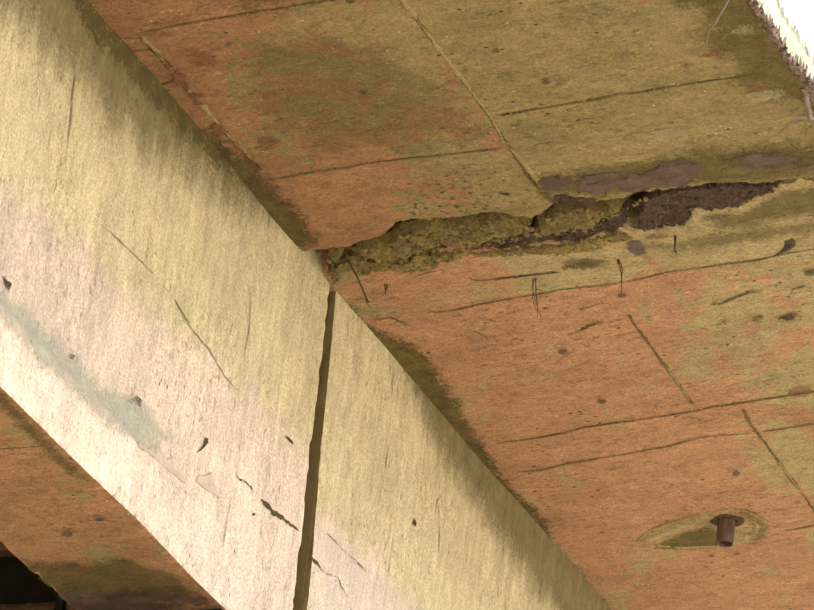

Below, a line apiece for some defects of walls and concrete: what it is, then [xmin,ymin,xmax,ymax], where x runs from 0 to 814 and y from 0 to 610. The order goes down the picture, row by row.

spalling [748,0,814,100]
leakage [780,0,814,59]
spalling [328,152,814,284]
crack [449,272,814,530]
crack [237,476,299,531]
crack [309,556,352,610]